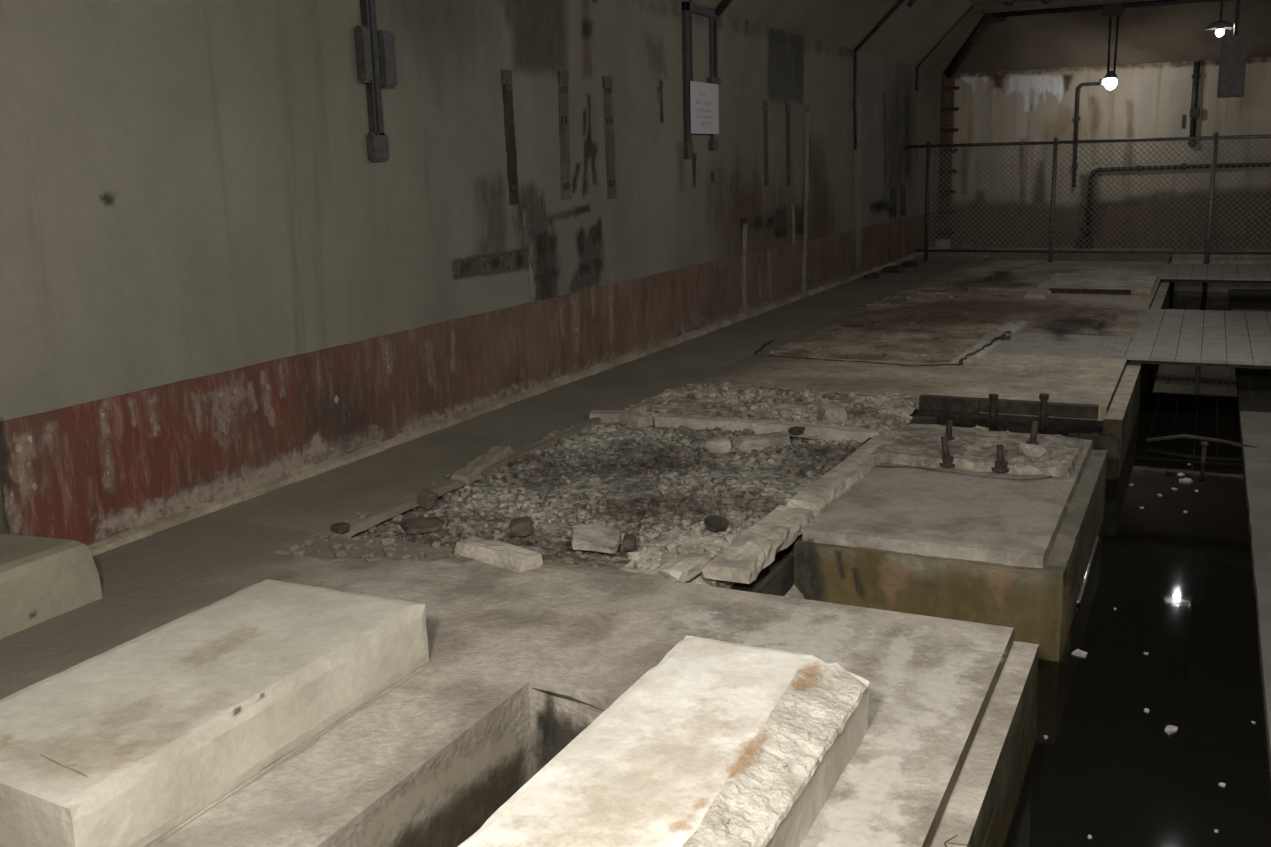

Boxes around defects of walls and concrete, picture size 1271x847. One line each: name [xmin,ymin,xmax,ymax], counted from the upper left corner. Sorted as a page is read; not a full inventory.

damp [1007,74,1064,112]
damp [518,95,602,300]
peeling [0,423,52,535]
peeling [96,274,849,539]
spalling [682,662,869,847]